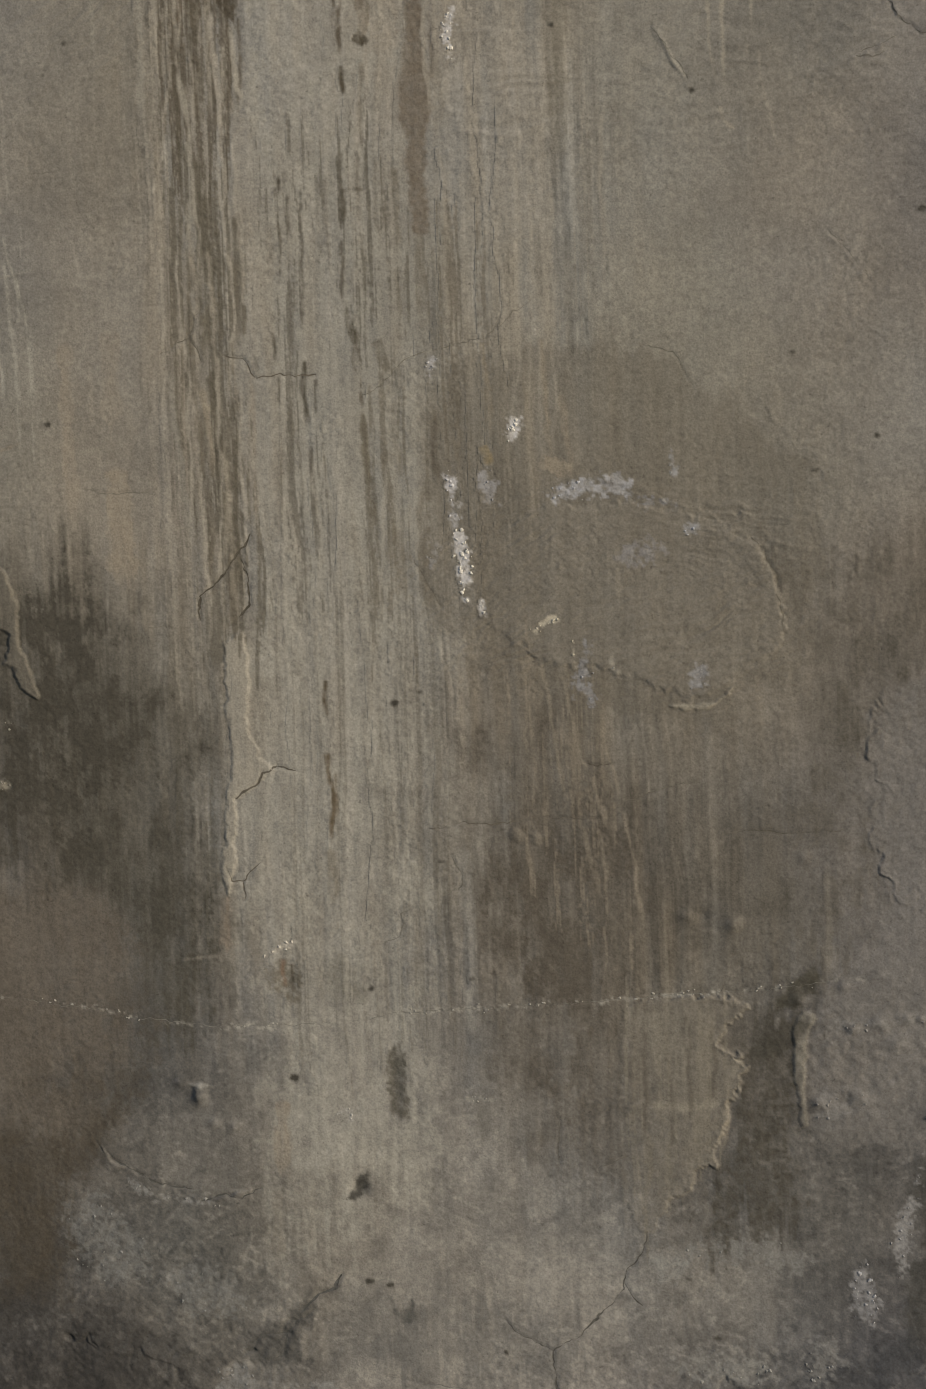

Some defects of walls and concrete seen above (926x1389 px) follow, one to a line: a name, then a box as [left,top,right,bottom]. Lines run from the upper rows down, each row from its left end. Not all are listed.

leakage [132,0,215,327]
leakage [209,0,229,217]
leakage [226,24,246,109]
leakage [155,78,219,601]
leakage [194,141,250,582]
crack [198,534,251,625]
leakage [229,537,252,626]
leakage [377,398,412,620]
crack [509,1238,647,1389]